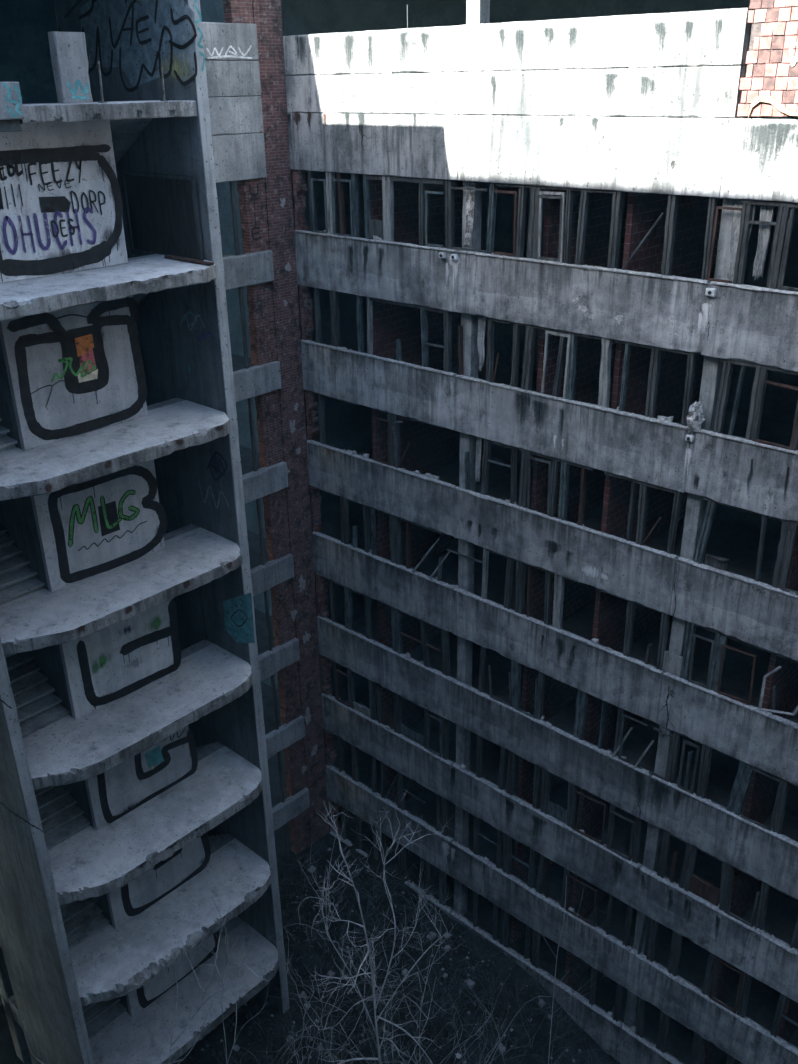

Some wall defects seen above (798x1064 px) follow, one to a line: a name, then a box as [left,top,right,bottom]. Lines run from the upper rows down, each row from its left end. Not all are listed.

water stain [296,36,320,60]
water stain [345,35,353,67]
water stain [499,29,524,63]
water stain [544,28,554,47]
water stain [567,27,586,67]
water stain [651,22,665,65]
water stain [605,74,617,94]
water stain [629,62,654,100]
water stain [345,112,364,139]
water stain [515,393,545,429]
water stain [684,448,699,487]